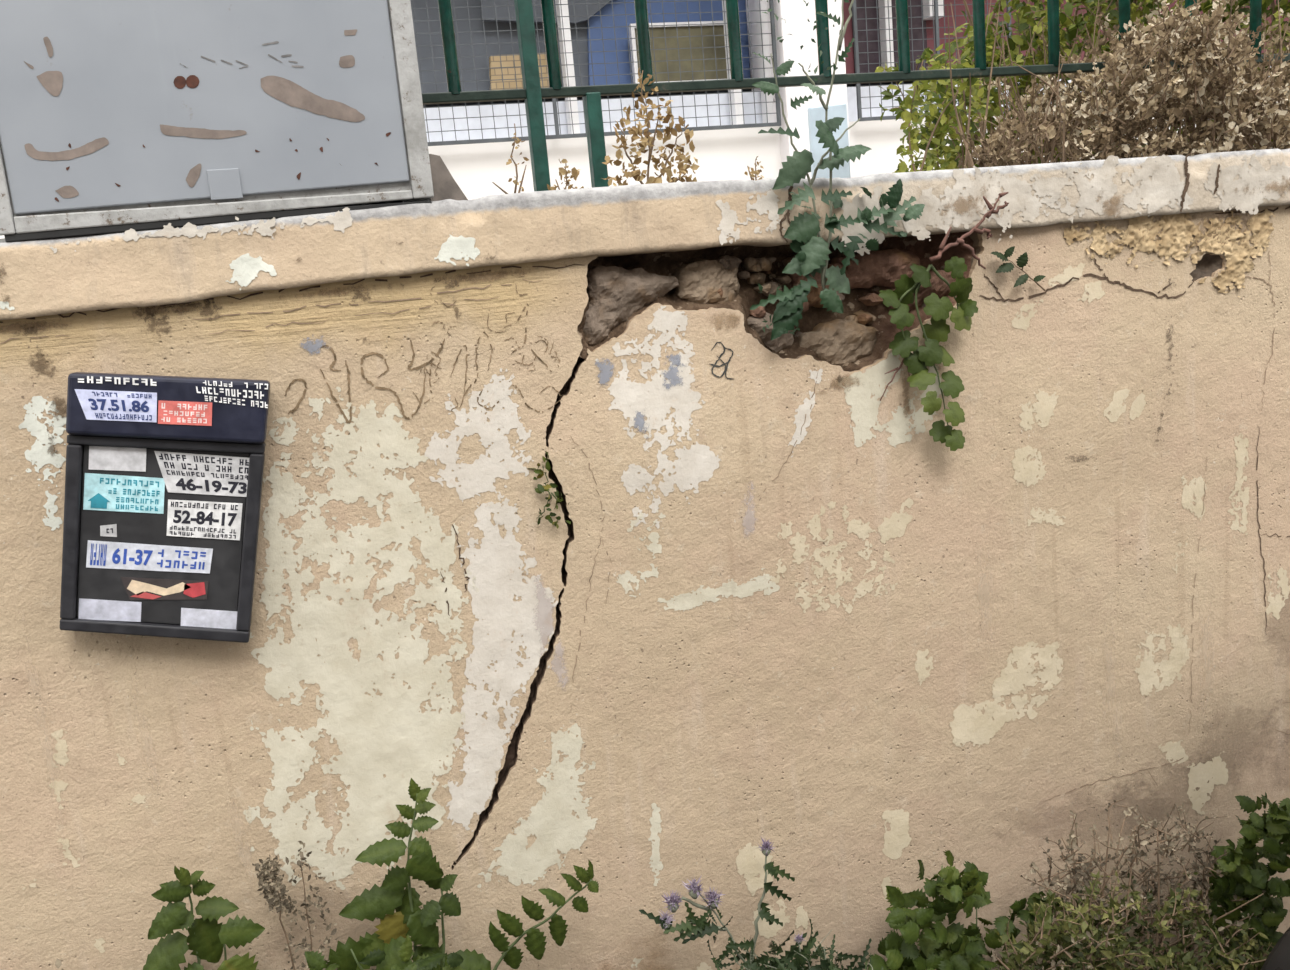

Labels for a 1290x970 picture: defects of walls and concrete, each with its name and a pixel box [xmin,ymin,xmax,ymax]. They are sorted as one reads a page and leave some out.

peeling [111,207,353,242]
peeling [226,253,277,290]
crack [979,258,1194,302]
crack [1180,154,1290,214]
peeling [19,396,66,531]
peeling [577,153,1290,620]
crack [1233,253,1290,635]
peeling [243,368,558,890]
crack [440,524,470,616]
crack [451,349,612,870]
peeling [950,641,1064,747]
peeling [477,723,598,891]